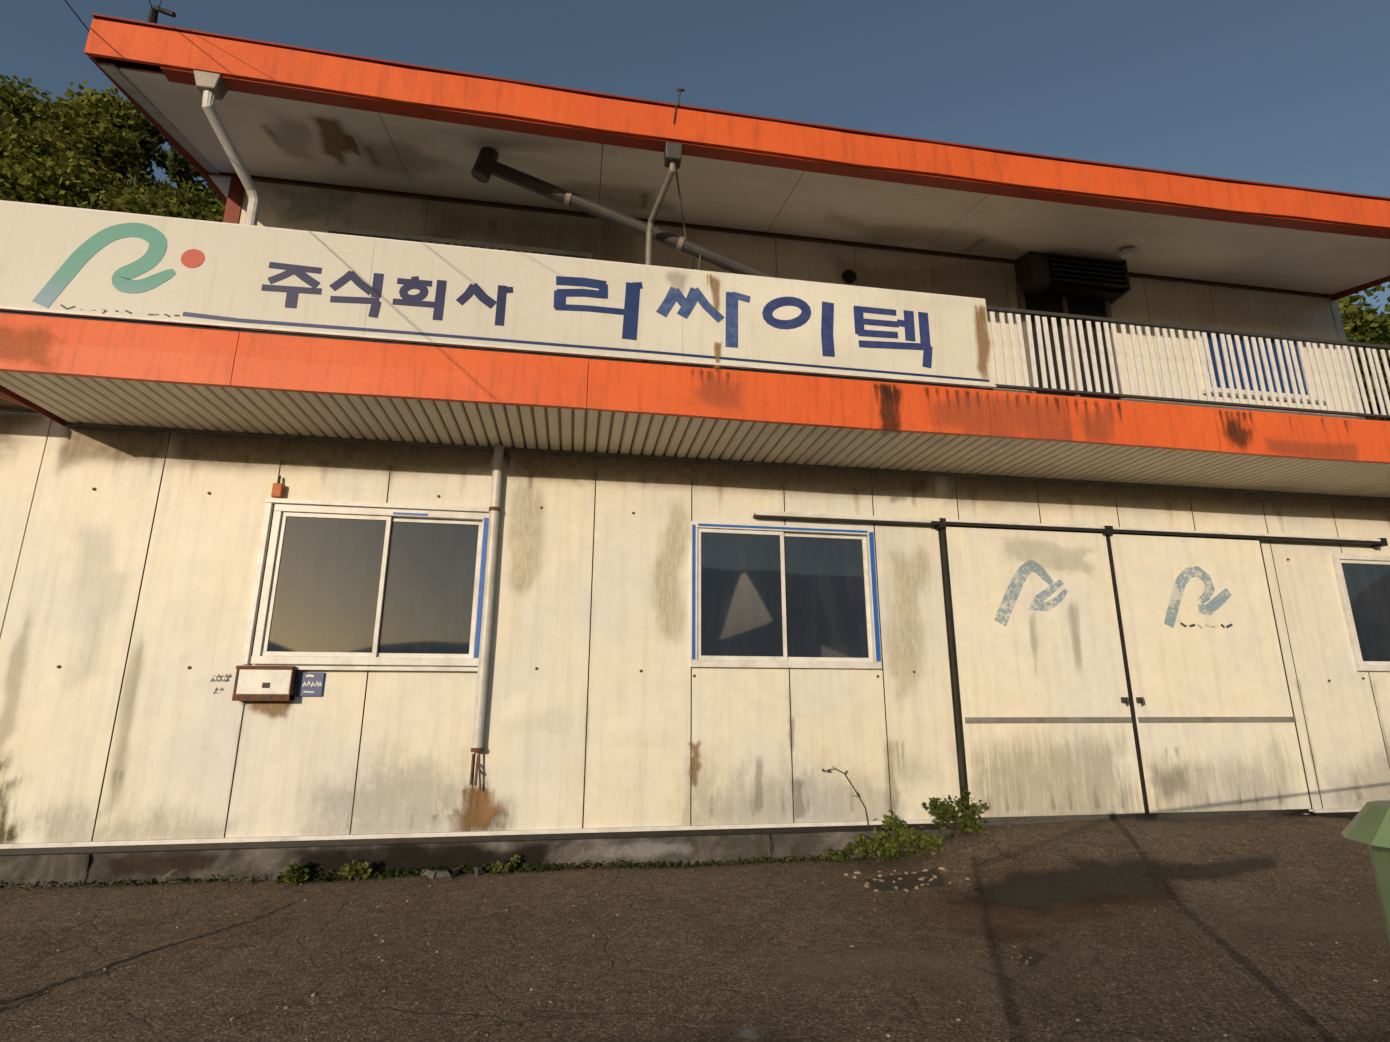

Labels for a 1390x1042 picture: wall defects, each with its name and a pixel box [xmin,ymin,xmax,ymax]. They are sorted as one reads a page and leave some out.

rust [690,743,700,785]
rust [457,787,503,831]
crack [0,902,295,1011]